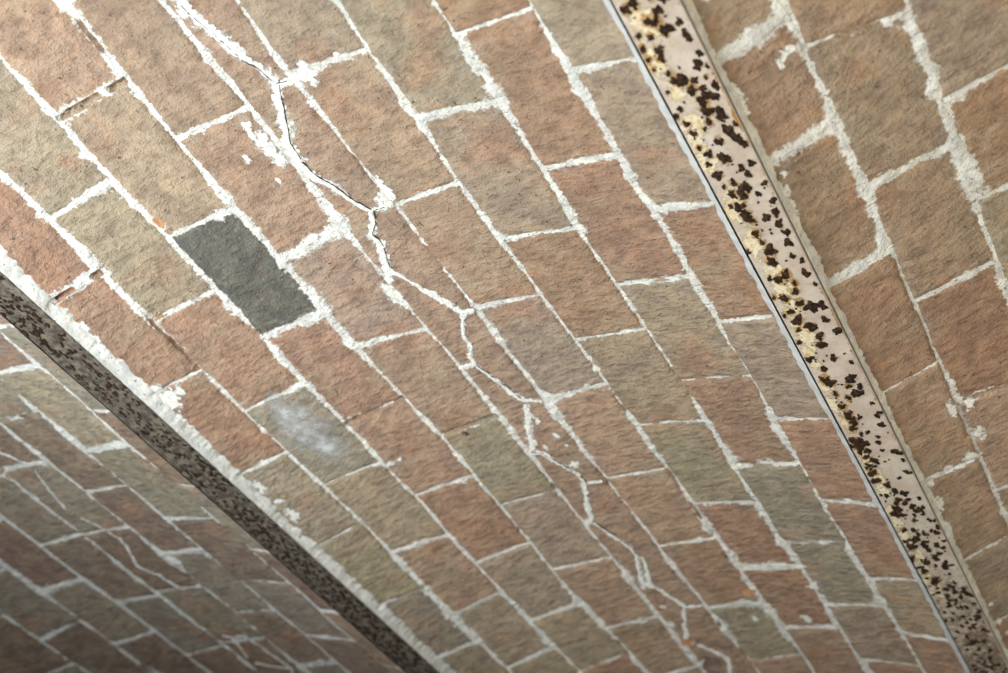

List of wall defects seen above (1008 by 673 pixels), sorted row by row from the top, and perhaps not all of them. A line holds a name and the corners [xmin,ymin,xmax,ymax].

efflorescence [272,400,341,456]
crack [171,0,734,673]
corrosion [619,0,1008,673]